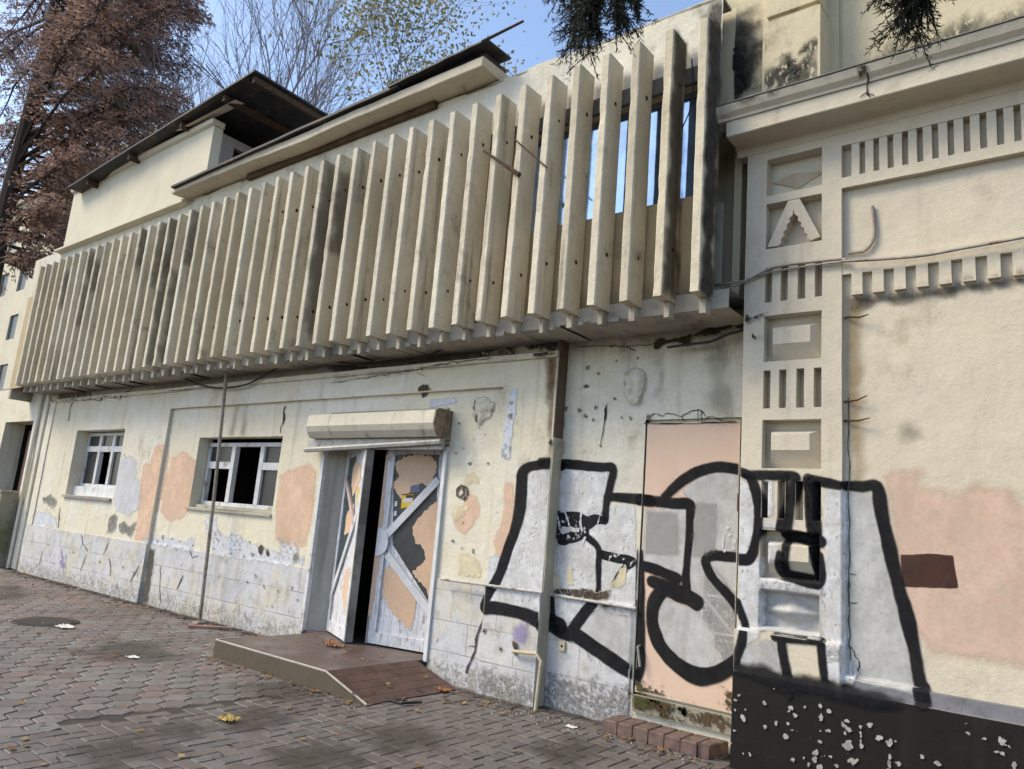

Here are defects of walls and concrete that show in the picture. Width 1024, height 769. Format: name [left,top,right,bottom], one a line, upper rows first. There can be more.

peeling [473,389,518,459]
crack [598,406,607,447]
peeling [205,517,305,612]
peeling [763,704,901,769]
peeling [983,737,1017,769]